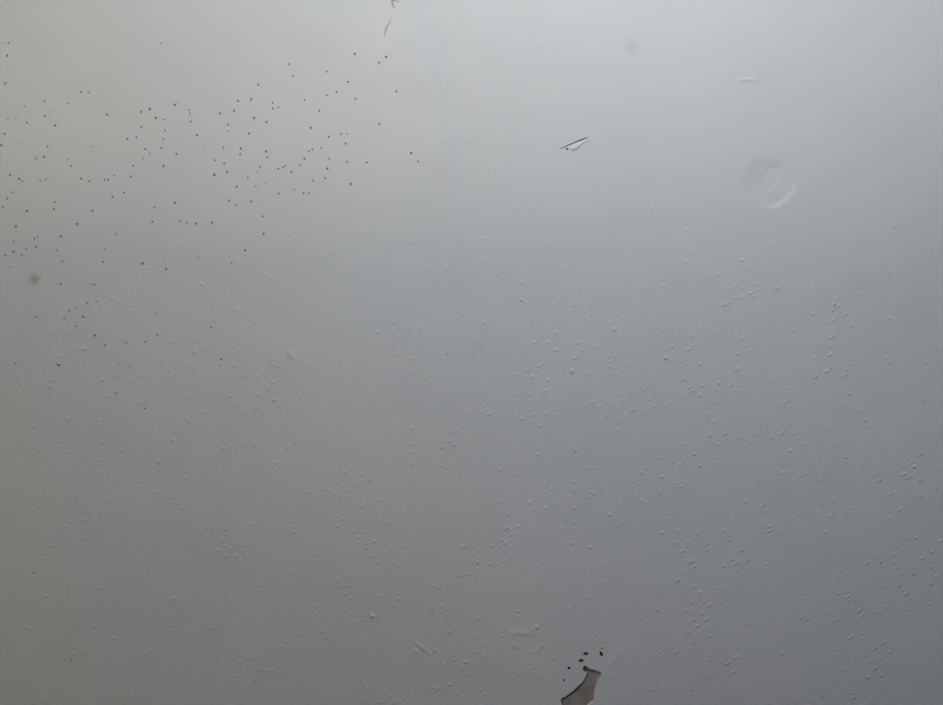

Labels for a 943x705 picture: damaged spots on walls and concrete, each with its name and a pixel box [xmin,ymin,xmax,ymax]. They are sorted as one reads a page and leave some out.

peeling [561,652,601,705]